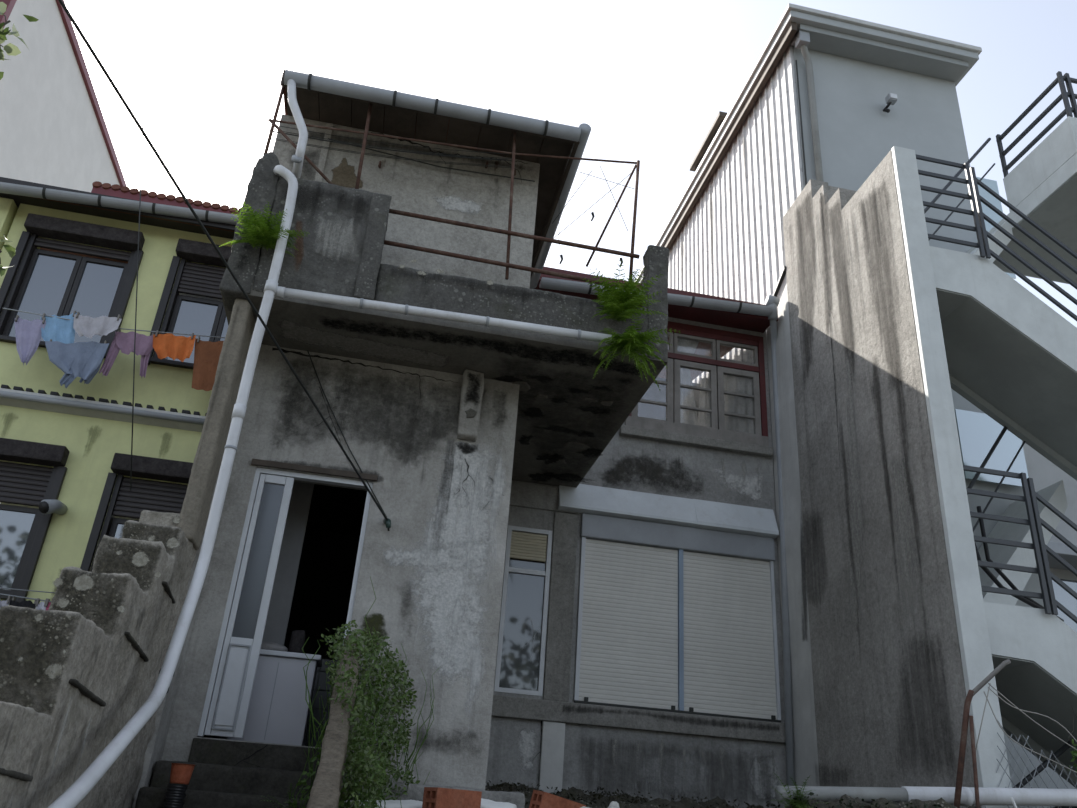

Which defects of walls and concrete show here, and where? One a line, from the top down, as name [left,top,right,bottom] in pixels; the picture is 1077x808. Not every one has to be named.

water stain [283,360,504,711]
crack [455,459,504,516]
water stain [606,458,702,491]
water stain [796,191,918,626]